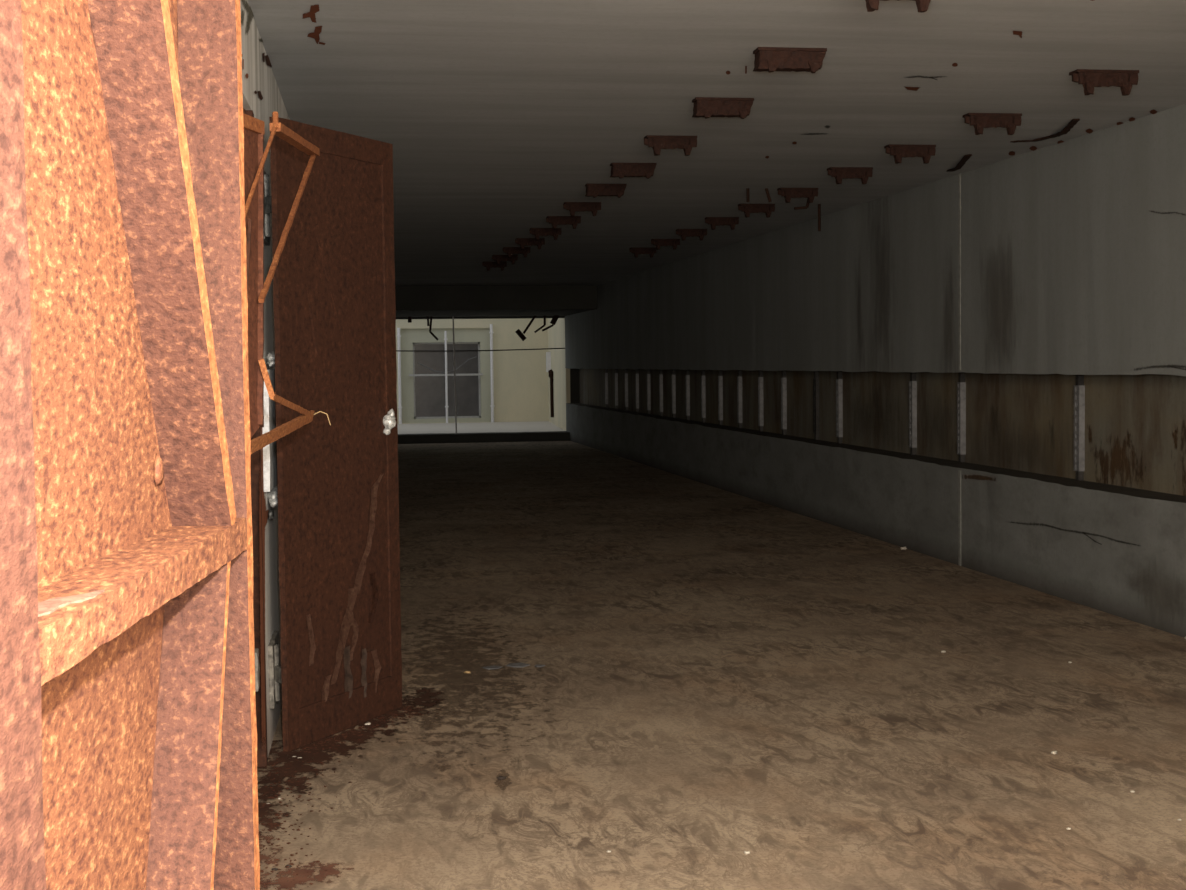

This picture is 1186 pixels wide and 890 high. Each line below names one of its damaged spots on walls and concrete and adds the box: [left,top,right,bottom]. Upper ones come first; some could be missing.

rust [303,5,326,45]
rust [154,453,164,486]
rust [1088,427,1143,486]
crack [1010,522,1139,546]
rust [257,427,455,890]